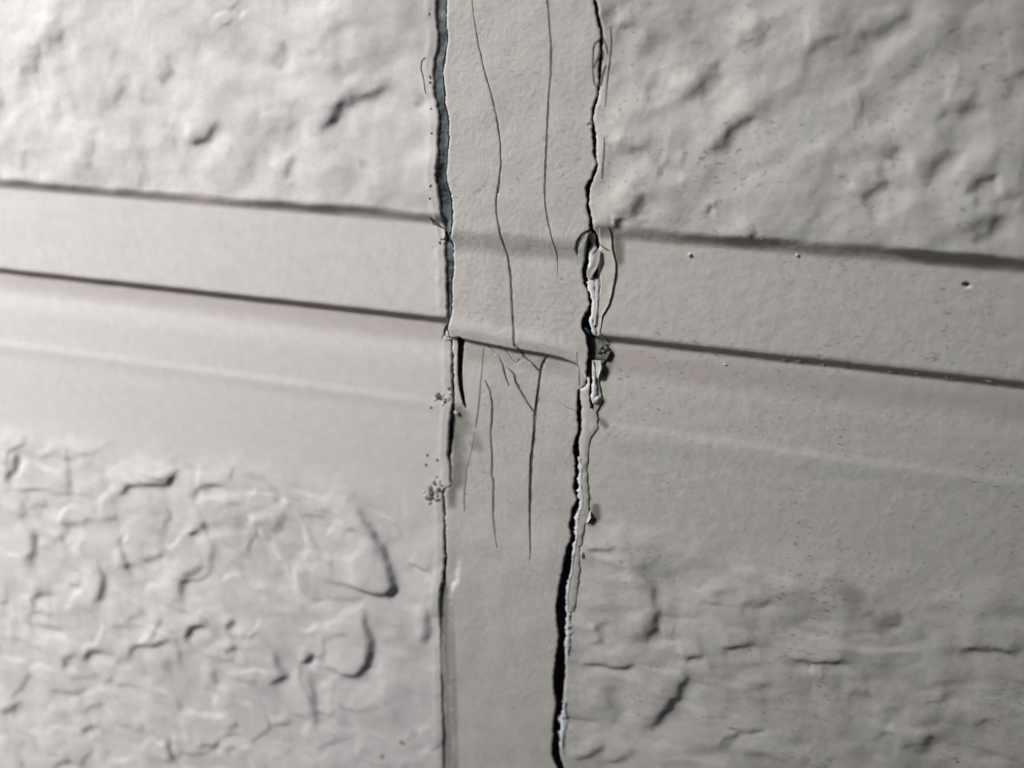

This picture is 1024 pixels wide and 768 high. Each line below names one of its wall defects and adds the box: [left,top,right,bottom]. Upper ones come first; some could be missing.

crack [420,0,609,768]
peeling [583,228,616,436]